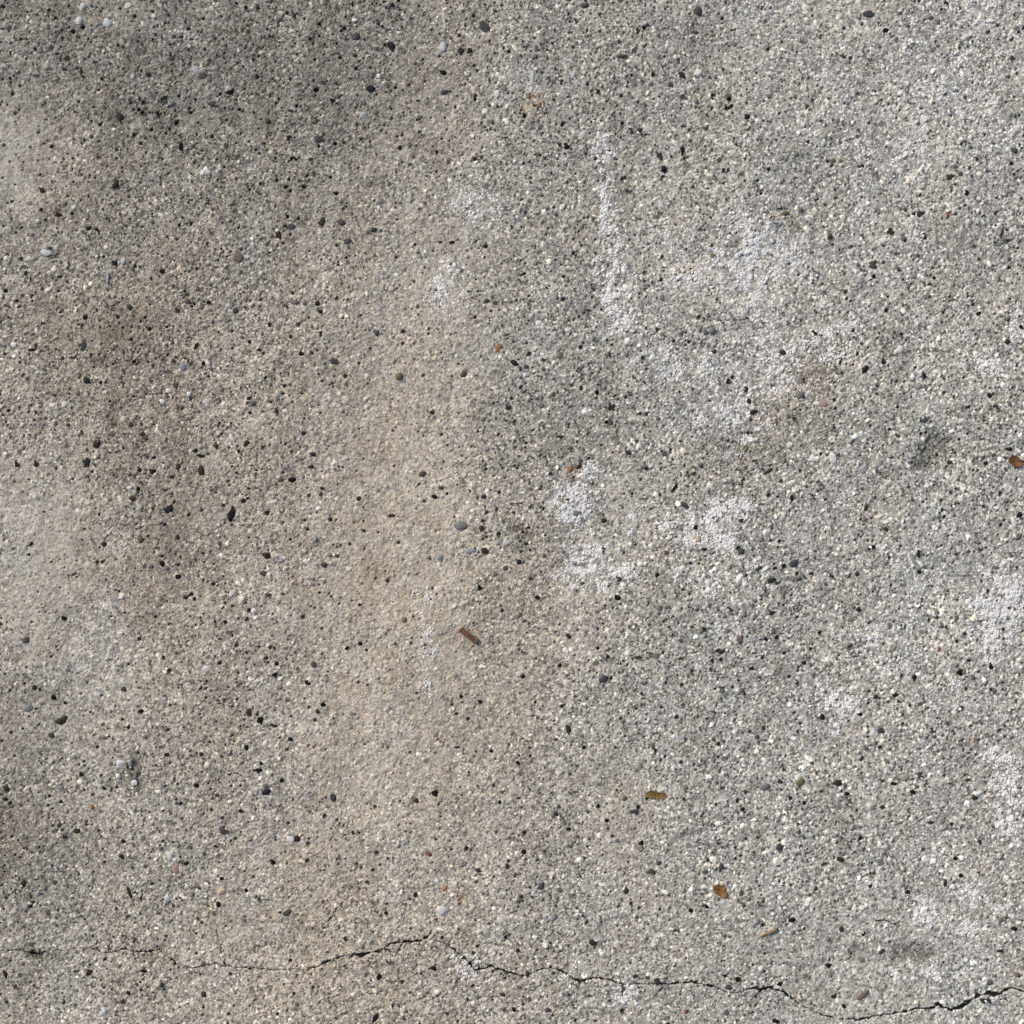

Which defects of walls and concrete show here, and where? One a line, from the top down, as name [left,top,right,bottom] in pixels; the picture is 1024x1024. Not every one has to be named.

crack [1,933,1023,1021]